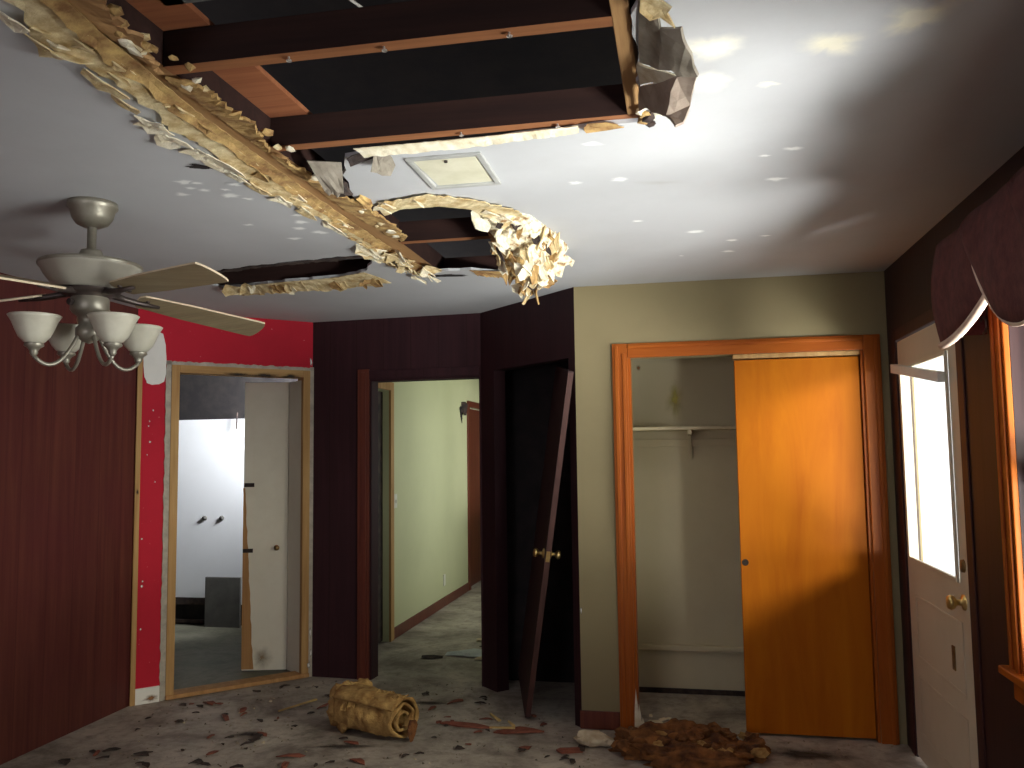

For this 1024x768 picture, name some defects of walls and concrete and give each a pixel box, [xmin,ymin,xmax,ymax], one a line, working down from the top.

spalling [67,0,442,284]
peeling [222,283,256,297]
peeling [329,278,383,292]
peeling [471,210,563,305]